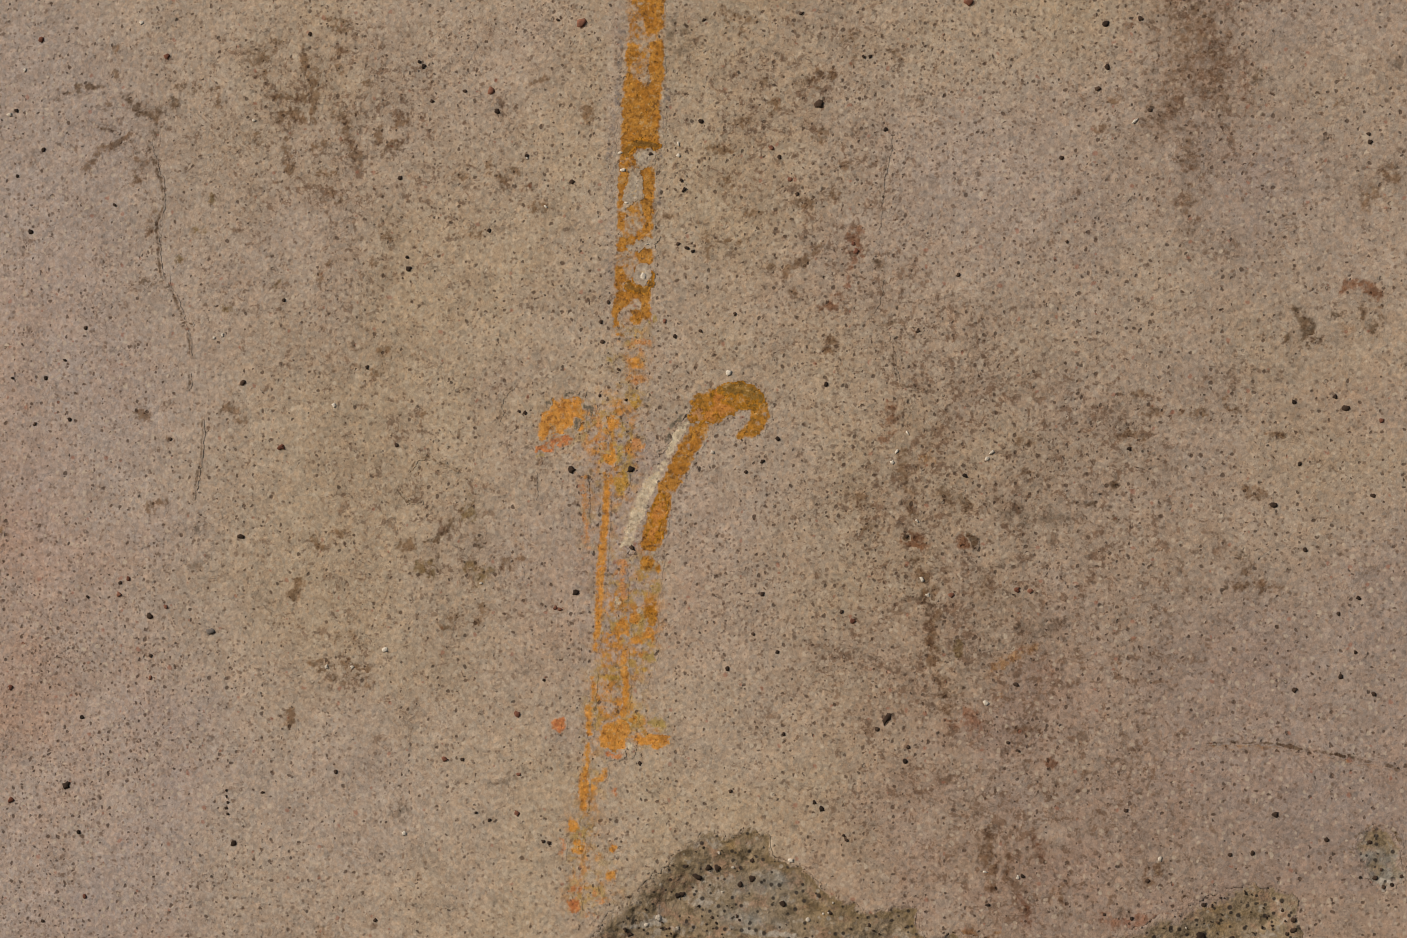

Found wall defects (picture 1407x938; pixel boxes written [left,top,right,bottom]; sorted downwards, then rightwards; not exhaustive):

flaking render [591,827,925,938]
flaking render [1111,882,1304,938]